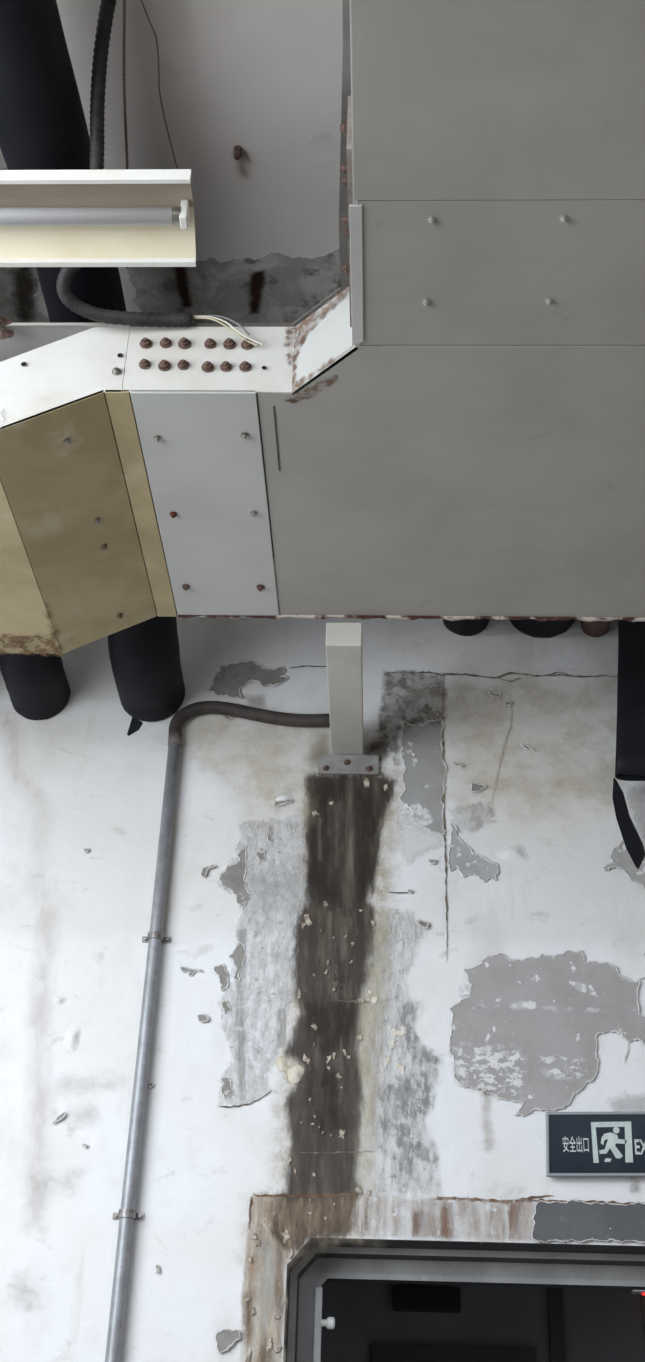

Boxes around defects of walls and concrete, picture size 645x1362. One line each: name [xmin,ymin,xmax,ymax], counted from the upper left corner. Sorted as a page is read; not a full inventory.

flaking render [125,248,340,323]
peeling [180,798,306,1108]
peeling [207,660,288,699]
water stain [256,775,396,1259]
crack [441,793,449,961]
peeling [398,719,500,882]
crack [389,671,617,801]
peeling [362,910,645,1194]
peeling [603,840,645,890]